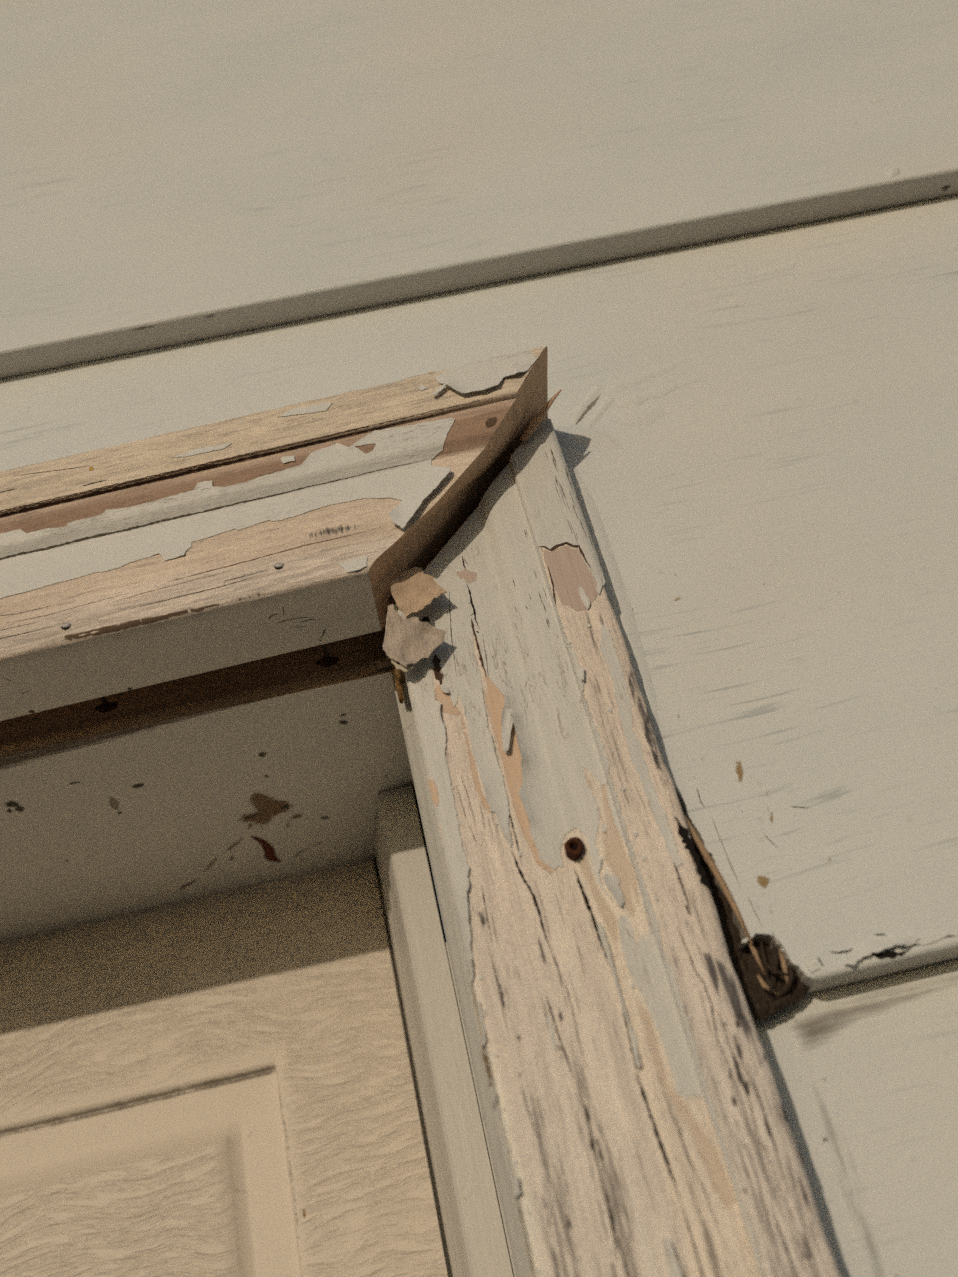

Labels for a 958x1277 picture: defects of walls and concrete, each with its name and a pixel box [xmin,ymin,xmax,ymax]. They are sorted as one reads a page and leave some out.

peeling [417,349,537,395]
peeling [0,417,455,599]
peeling [383,419,637,1277]
peeling [844,933,949,965]
peeling [642,1010,733,1206]